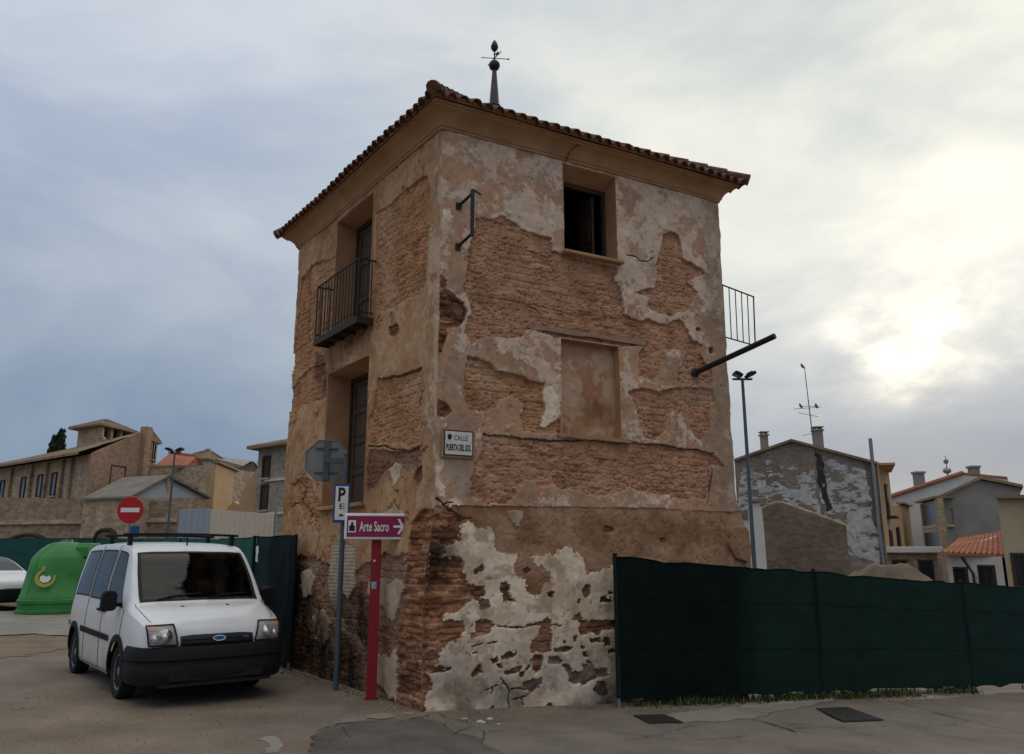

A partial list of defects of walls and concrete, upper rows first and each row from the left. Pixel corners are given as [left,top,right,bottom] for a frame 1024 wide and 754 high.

flaking render [375,175,454,312]
flaking render [366,215,725,527]
peeling [737,459,881,563]
peeling [300,538,405,644]
peeling [377,649,399,700]
peeling [424,521,644,712]